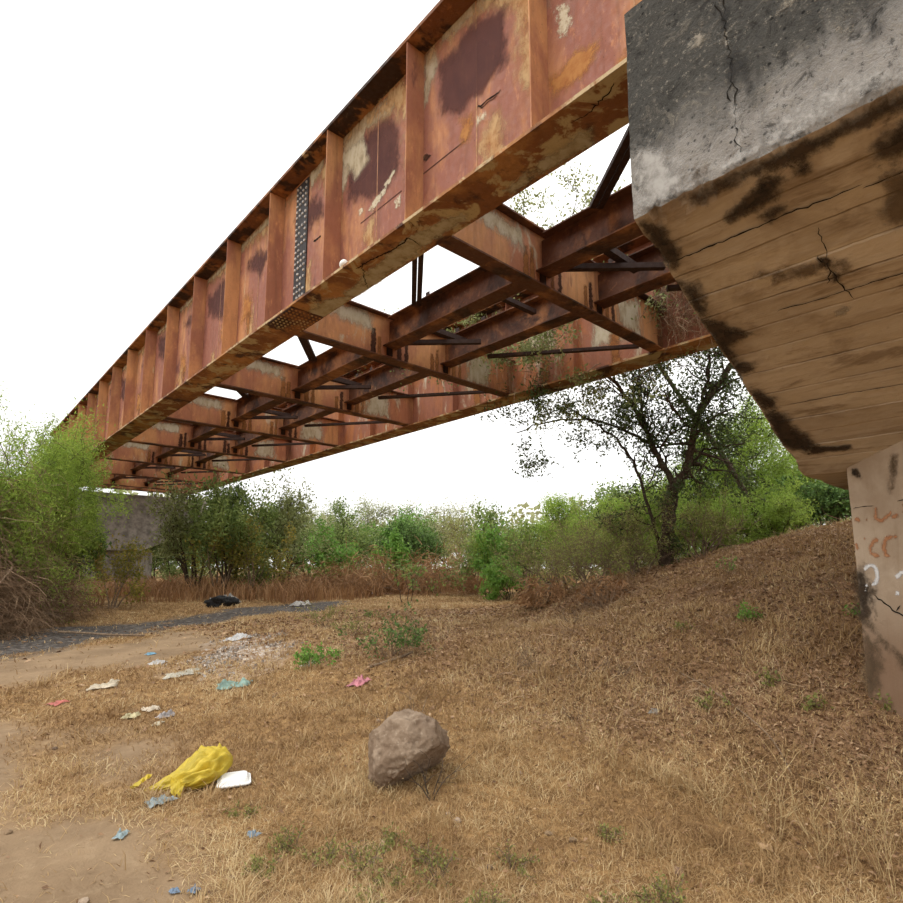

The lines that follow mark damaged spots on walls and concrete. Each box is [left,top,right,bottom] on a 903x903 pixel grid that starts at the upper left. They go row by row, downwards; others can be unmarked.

peeling [556,3,572,38]
rust [428,0,530,142]
crack [714,0,741,153]
rust [208,265,226,340]
rust [241,220,269,275]
rust [348,82,406,202]
damp [635,151,682,204]
damp [676,281,754,375]
crack [679,171,903,260]
damp [690,70,903,224]
crack [781,228,903,310]
damp [752,391,851,455]